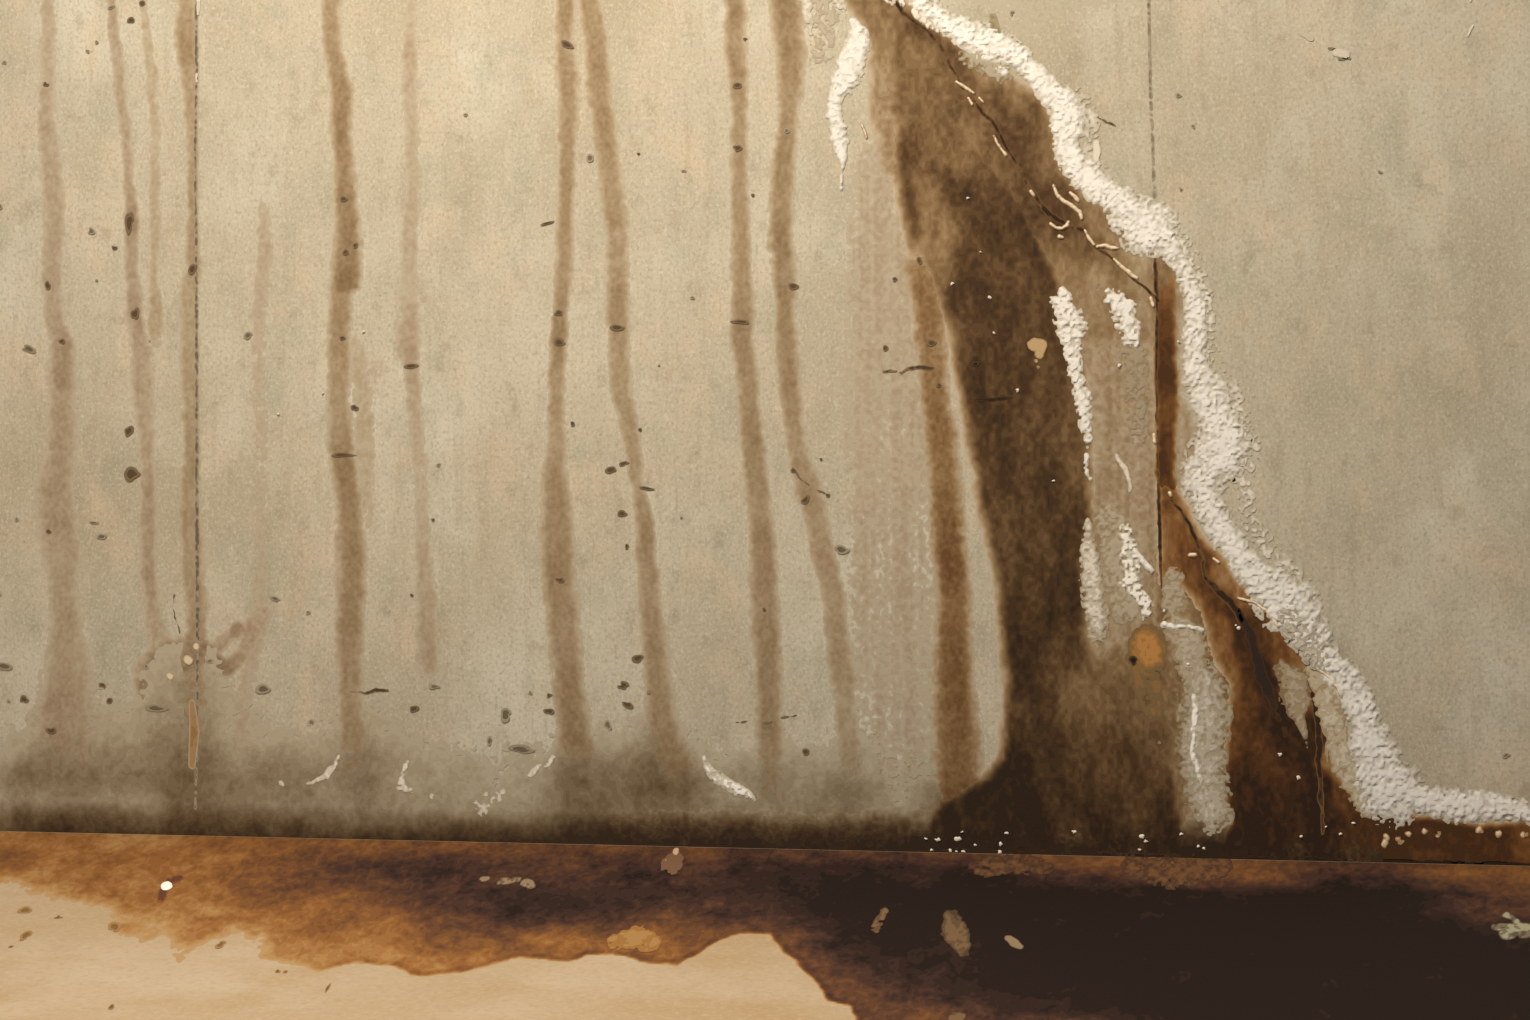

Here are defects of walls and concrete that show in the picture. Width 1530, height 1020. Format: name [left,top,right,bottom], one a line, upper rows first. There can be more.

water stain [105,0,167,645]
water stain [173,0,209,642]
water stain [396,0,441,683]
crack [883,365,934,374]
crack [891,0,1530,866]
water stain [1160,567,1196,626]
water stain [1160,621,1204,632]
water stain [1163,628,1213,682]
water stain [1189,693,1203,784]
water stain [1272,623,1365,812]
water stain [967,834,1012,854]
water stain [1001,829,1103,856]